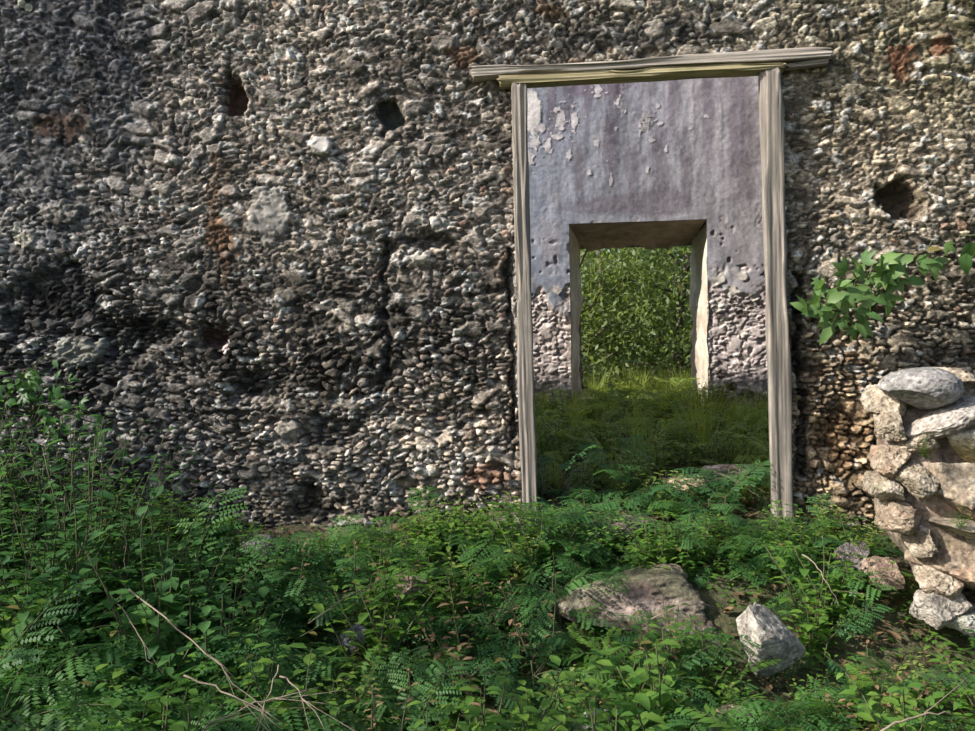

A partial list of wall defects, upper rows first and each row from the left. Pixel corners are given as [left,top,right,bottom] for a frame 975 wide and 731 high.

peeling [527,88,586,174]
peeling [584,84,626,113]
peeling [634,102,668,152]
spalling [532,284,572,415]
spalling [707,264,768,410]